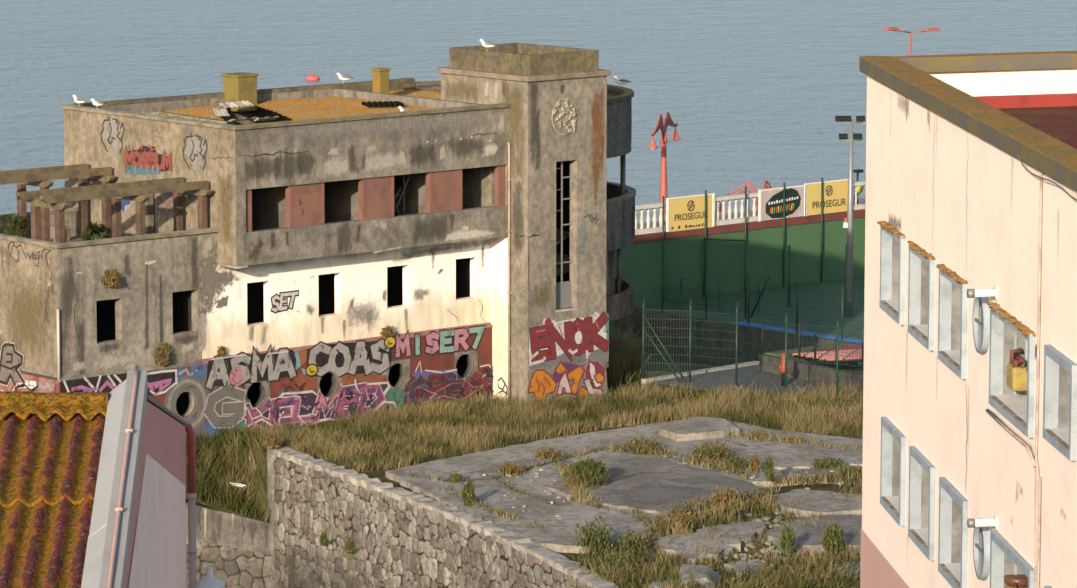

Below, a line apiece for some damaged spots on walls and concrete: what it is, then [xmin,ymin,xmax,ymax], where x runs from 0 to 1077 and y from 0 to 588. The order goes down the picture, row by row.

crack [213,151,309,167]
leakage [246,153,313,177]
leakage [290,111,485,170]
rust [592,93,604,199]
flaking render [198,236,248,355]
leakage [343,300,378,334]
crack [962,397,970,489]